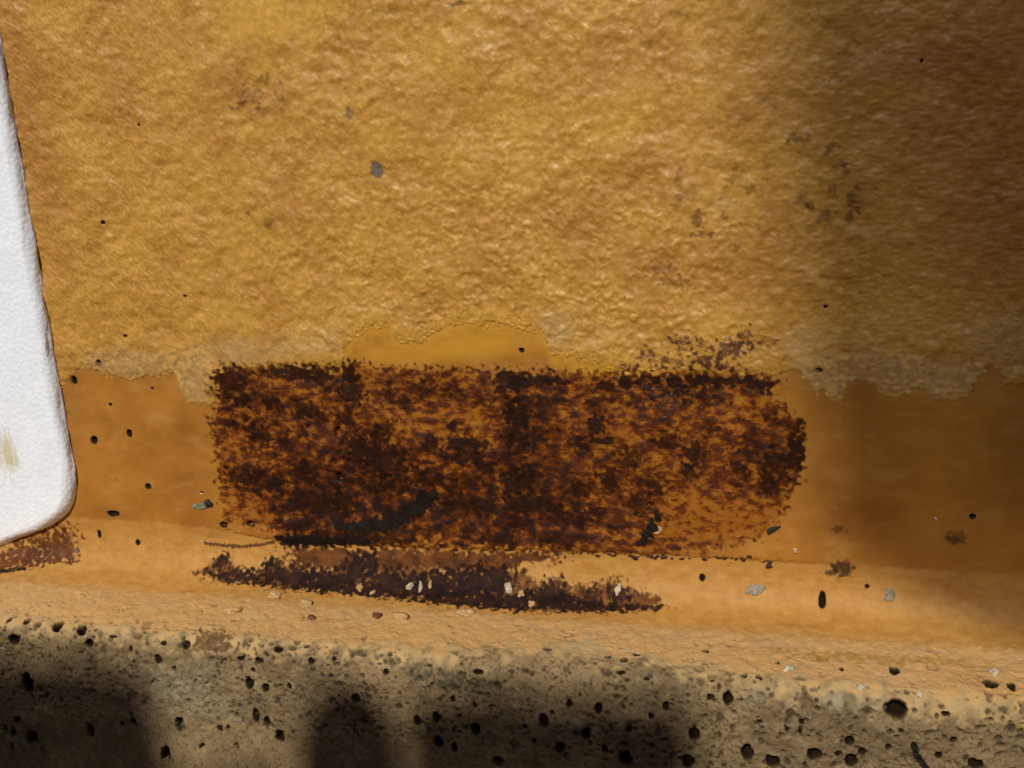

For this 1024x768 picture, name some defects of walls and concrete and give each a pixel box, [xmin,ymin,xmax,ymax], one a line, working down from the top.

peeling [192,491,213,509]
corrosion [192,323,808,614]